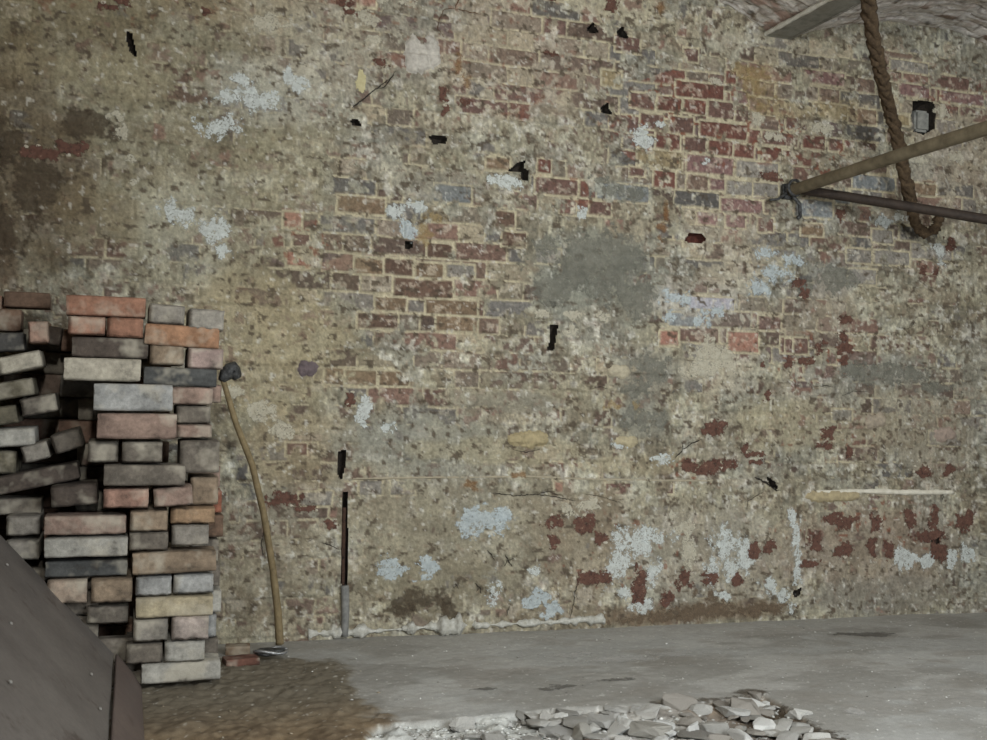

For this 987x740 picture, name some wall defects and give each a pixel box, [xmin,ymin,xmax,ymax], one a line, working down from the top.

leakage [191,65,312,142]
spalling [911,100,951,135]
spalling [429,135,447,145]
peeling [486,160,529,191]
spalling [685,233,706,243]
peeling [516,222,659,351]
spalling [539,496,611,550]
spalling [799,504,976,571]
leakage [484,580,503,607]
spalling [630,562,651,605]
spalling [659,570,746,608]
leakage [603,507,803,625]